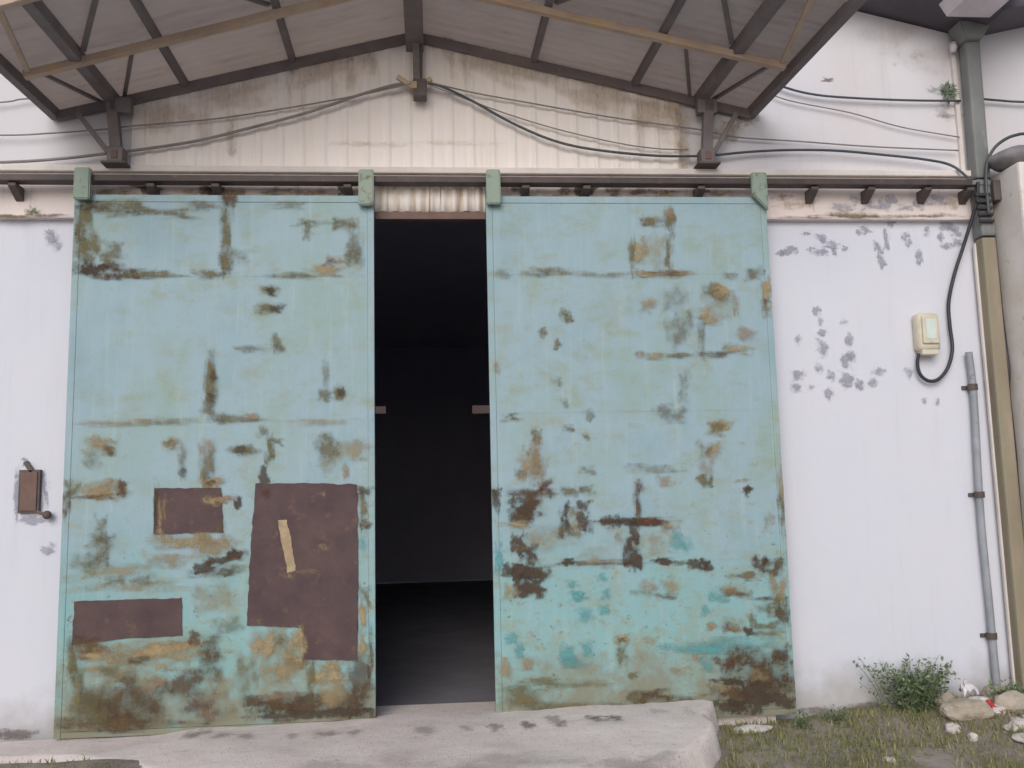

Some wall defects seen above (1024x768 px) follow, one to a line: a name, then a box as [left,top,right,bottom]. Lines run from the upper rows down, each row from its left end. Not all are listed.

corrosion [73,185,188,280]
corrosion [200,186,245,278]
peeling [779,232,848,255]
peeling [856,222,896,269]
peeling [925,222,962,249]
peeling [816,329,886,399]
corrosion [153,490,234,575]
corrosion [492,434,713,598]
corrosion [707,556,789,636]
corrosion [57,631,219,733]
corrosion [243,588,374,722]
corrosion [710,645,796,715]